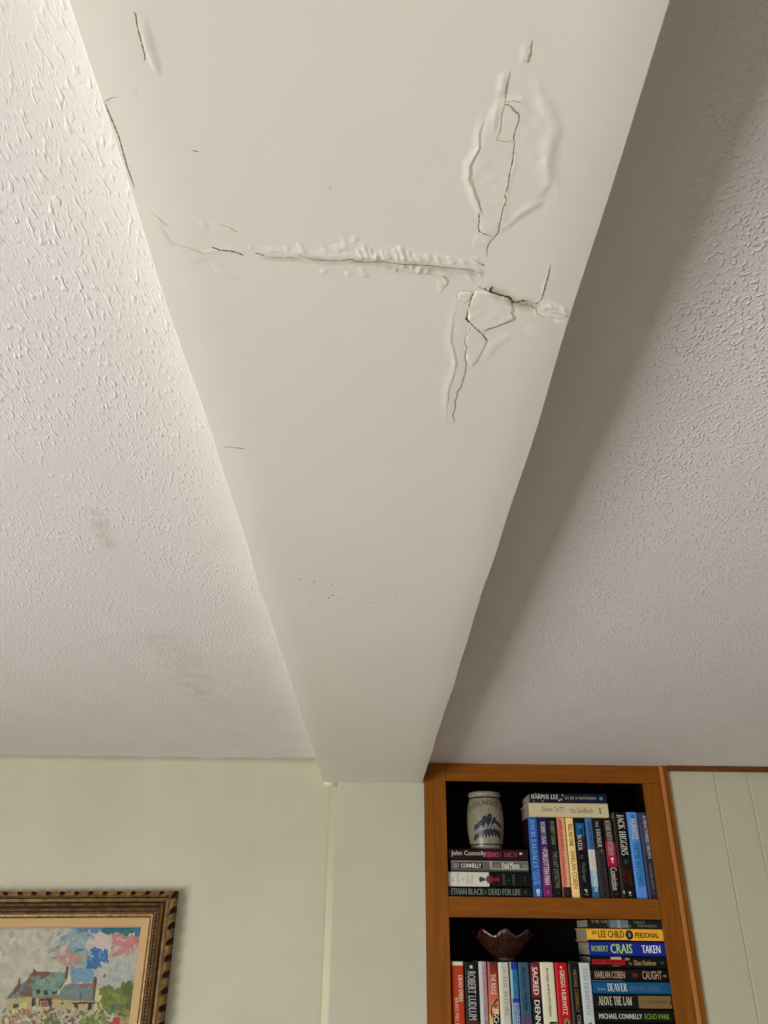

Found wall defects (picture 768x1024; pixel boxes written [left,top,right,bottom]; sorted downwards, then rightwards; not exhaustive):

crack [134,12,145,60]
crack [104,97,134,186]
crack [183,41,569,421]